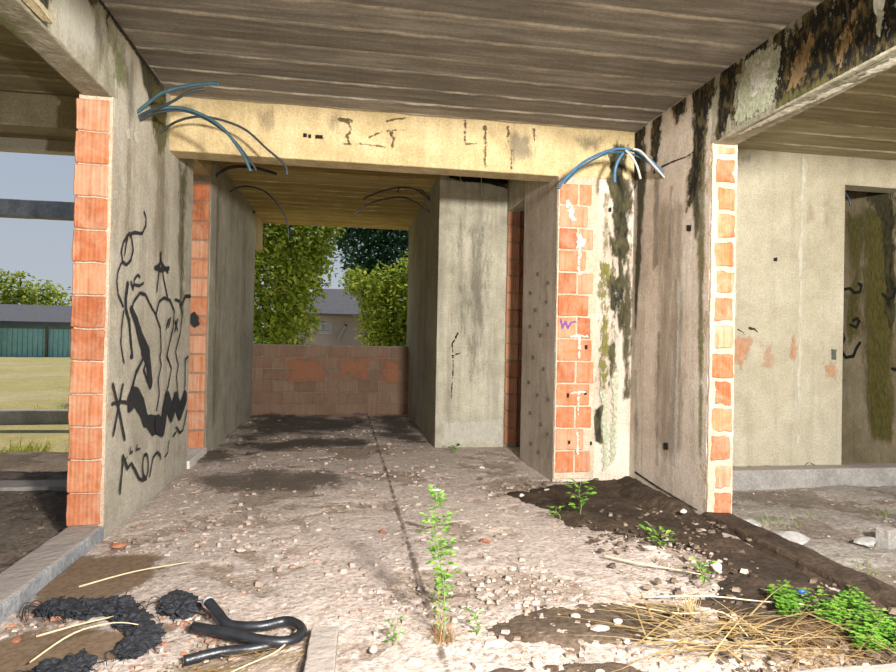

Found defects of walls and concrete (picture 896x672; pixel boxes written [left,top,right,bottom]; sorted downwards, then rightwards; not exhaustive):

leakage [59,0,97,53]
leakage [112,41,128,85]
leakage [672,0,896,238]
peeling [738,56,896,135]
leakage [607,115,662,399]
flaking render [710,146,753,513]
leakage [594,405,603,444]